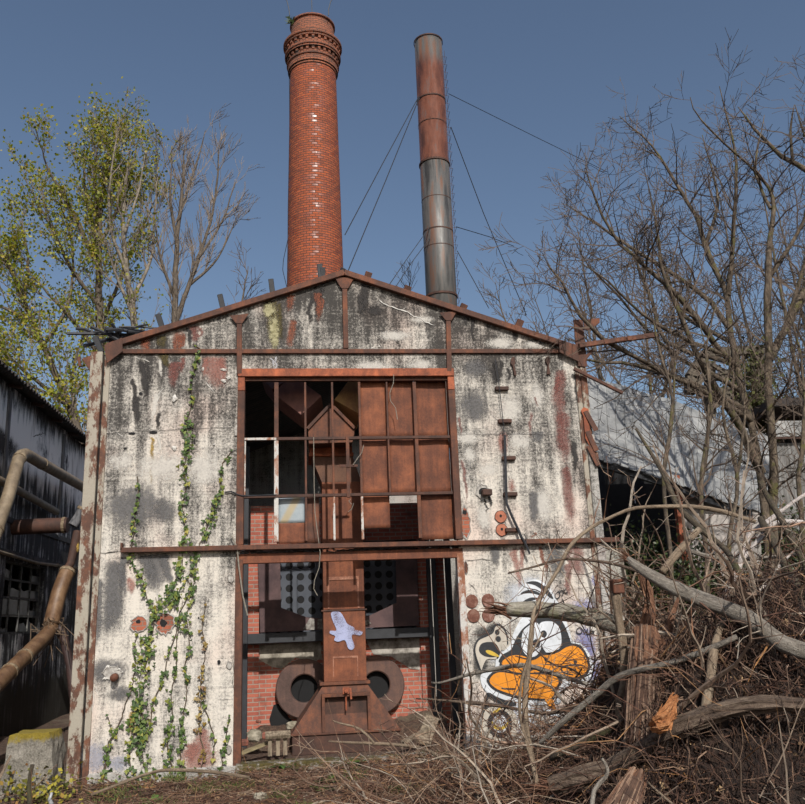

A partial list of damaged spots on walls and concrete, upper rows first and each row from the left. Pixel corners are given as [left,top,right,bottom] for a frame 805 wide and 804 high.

corrosion [554,371,569,455]
corrosion [563,467,573,517]
water stain [96,557,128,638]
water stain [140,553,173,589]